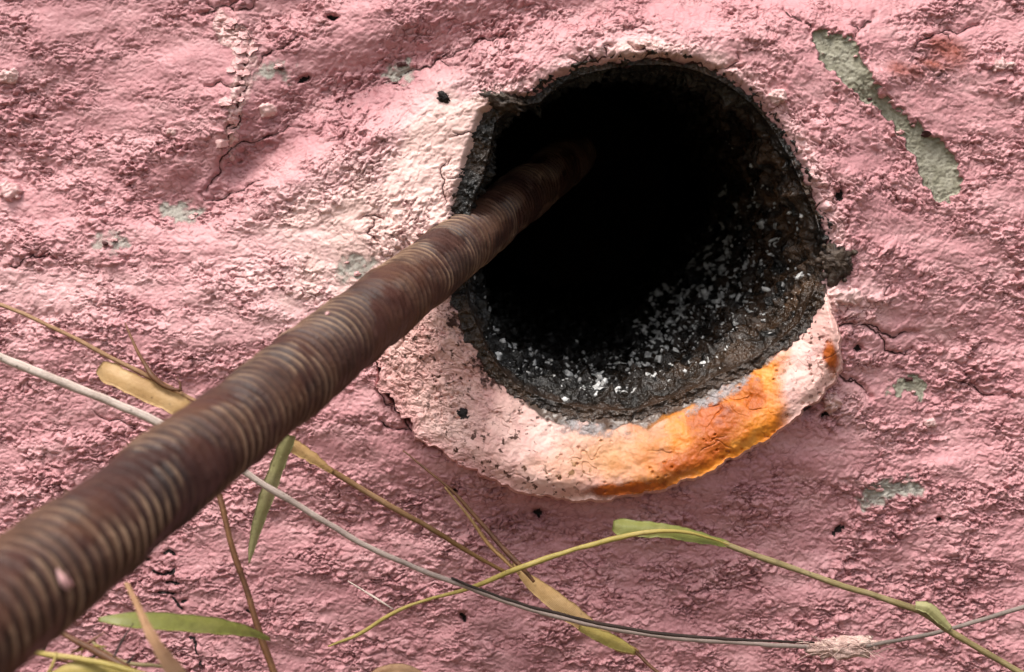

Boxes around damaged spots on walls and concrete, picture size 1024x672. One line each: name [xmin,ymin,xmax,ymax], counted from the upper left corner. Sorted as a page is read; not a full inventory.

crack [202,3,306,201]
peeling [812,29,963,204]
crack [839,323,908,355]
corrosion [823,342,838,371]
crack [839,374,868,395]
peeling [885,374,927,402]
corrosion [583,359,784,497]
peeling [859,479,924,512]